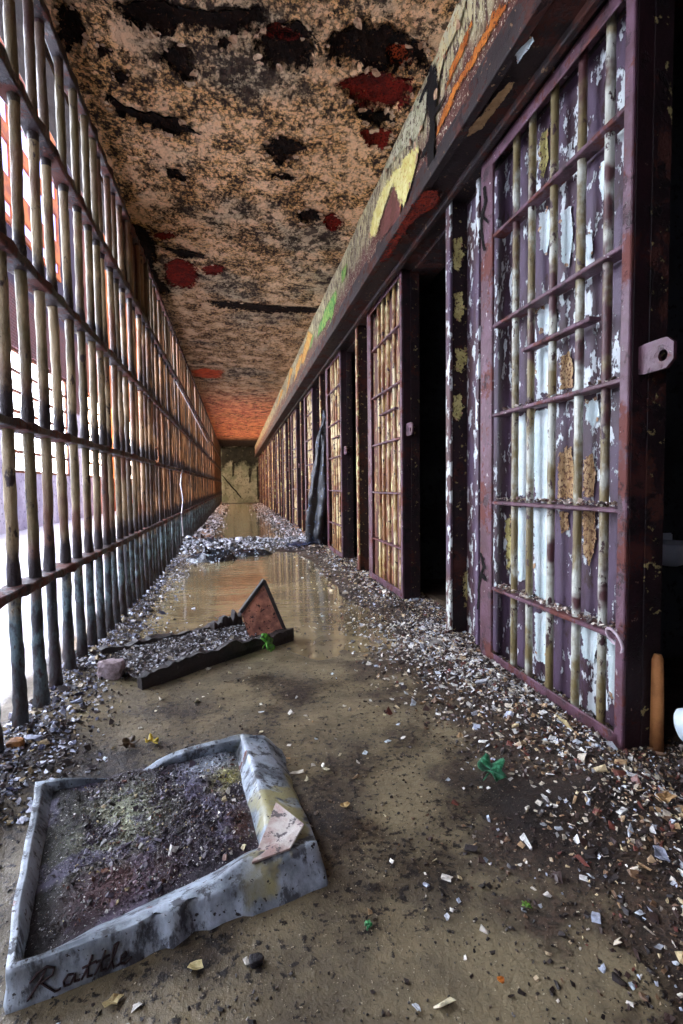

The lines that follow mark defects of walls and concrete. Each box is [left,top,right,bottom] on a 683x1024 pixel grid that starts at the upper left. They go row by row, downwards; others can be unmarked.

spalling [99,0,465,241]
flaking render [132,224,226,296]
peeling [455,348,468,373]
peeling [535,303,573,394]
peeling [452,393,465,422]
peeling [585,396,599,427]
peeling [504,409,597,664]
peeling [580,626,615,699]